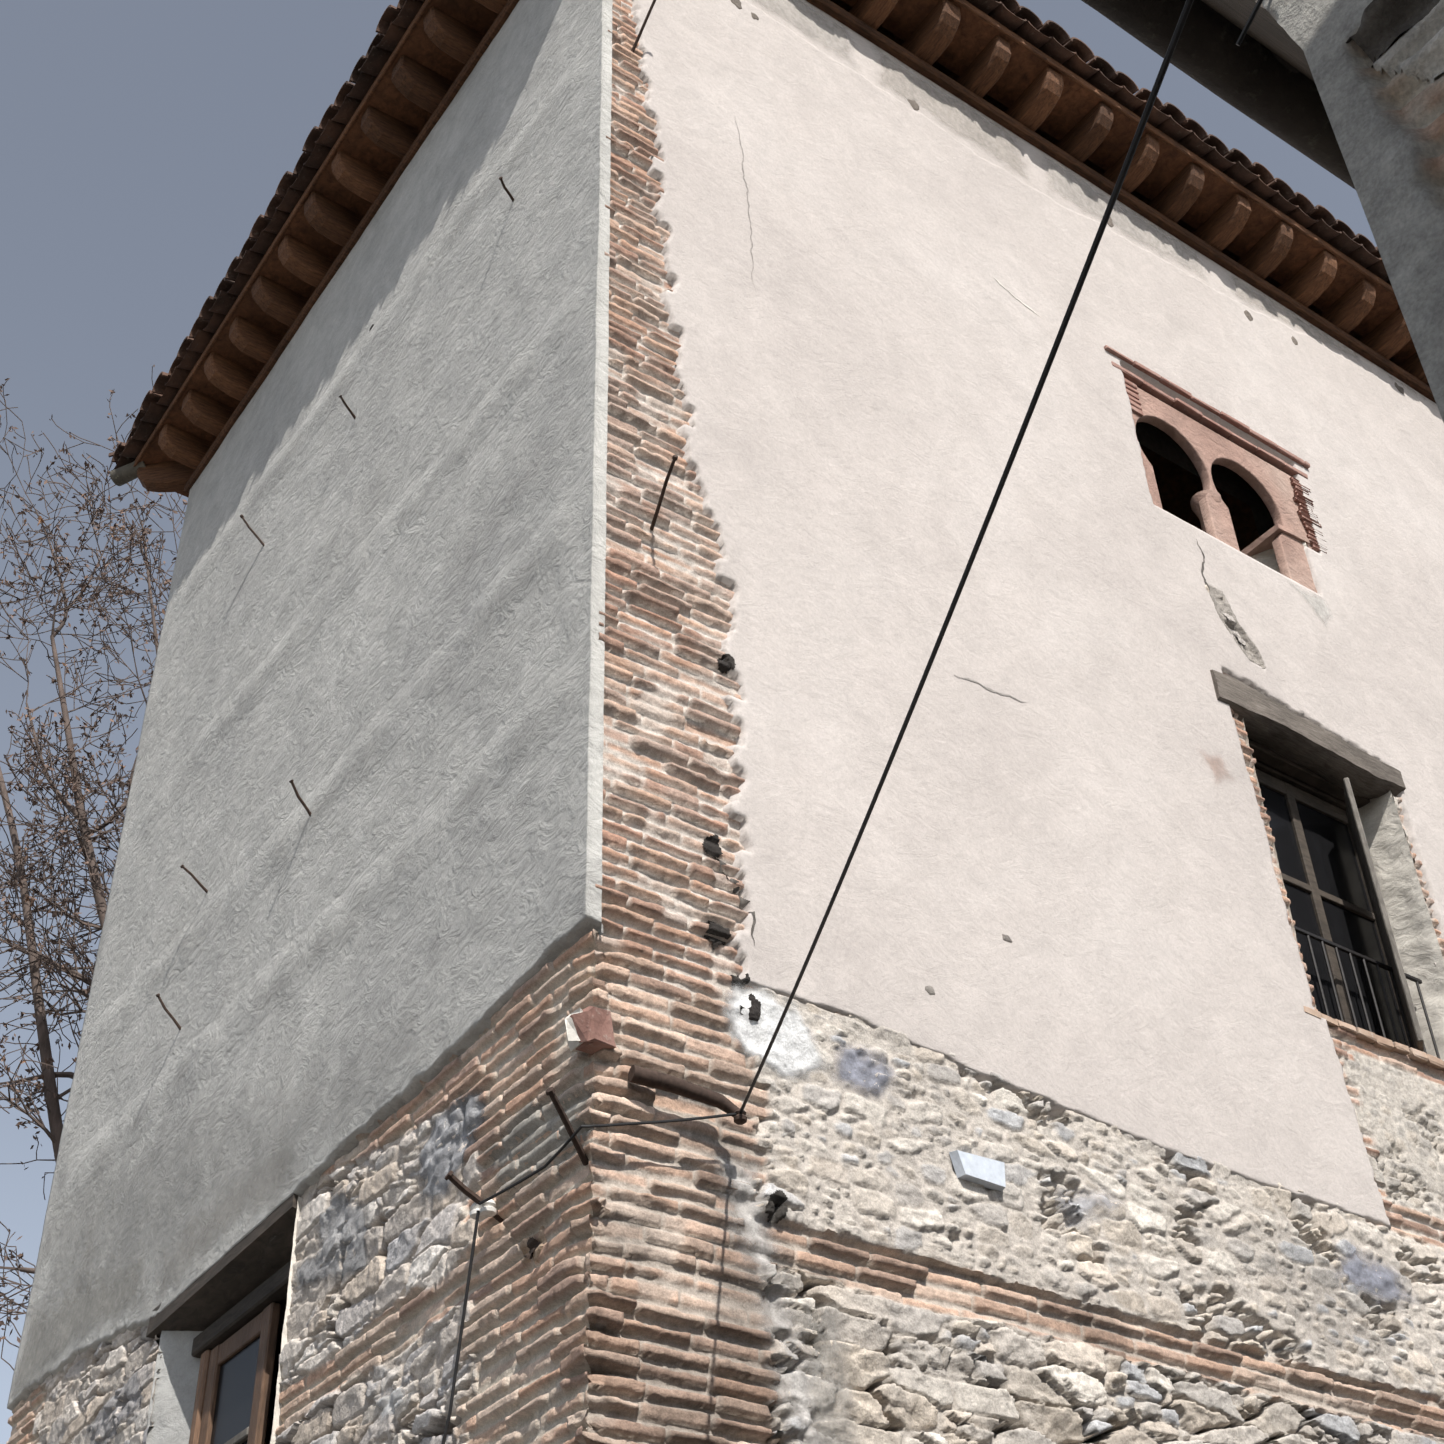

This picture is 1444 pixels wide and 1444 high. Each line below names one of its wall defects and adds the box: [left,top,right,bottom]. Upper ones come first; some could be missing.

flaking render [731,0,847,55]
flaking render [884,57,1023,174]
crack [735,120,756,292]
flaking render [1050,165,1199,271]
flaking render [1234,279,1357,357]
flaking render [1196,539,1266,669]
spalling [717,653,736,674]
spalling [702,834,723,858]
spalling [704,920,731,950]
spalling [730,973,750,990]